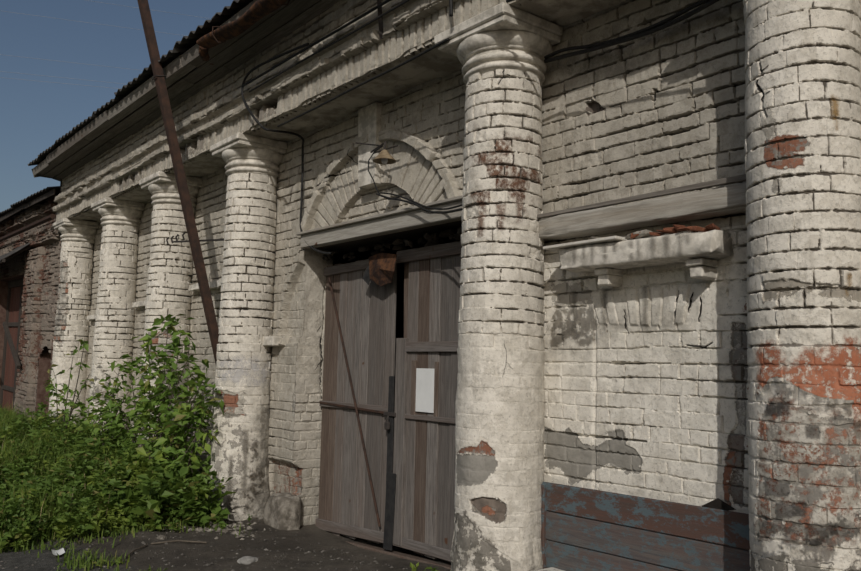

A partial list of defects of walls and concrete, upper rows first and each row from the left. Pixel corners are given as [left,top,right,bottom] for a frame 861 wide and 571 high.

flaking render [761,105,810,194]
crack [674,290,702,322]
peeling [213,390,247,521]
peeling [456,440,498,486]
peeling [544,427,643,485]
spalling [702,322,861,571]
peeling [451,496,511,571]